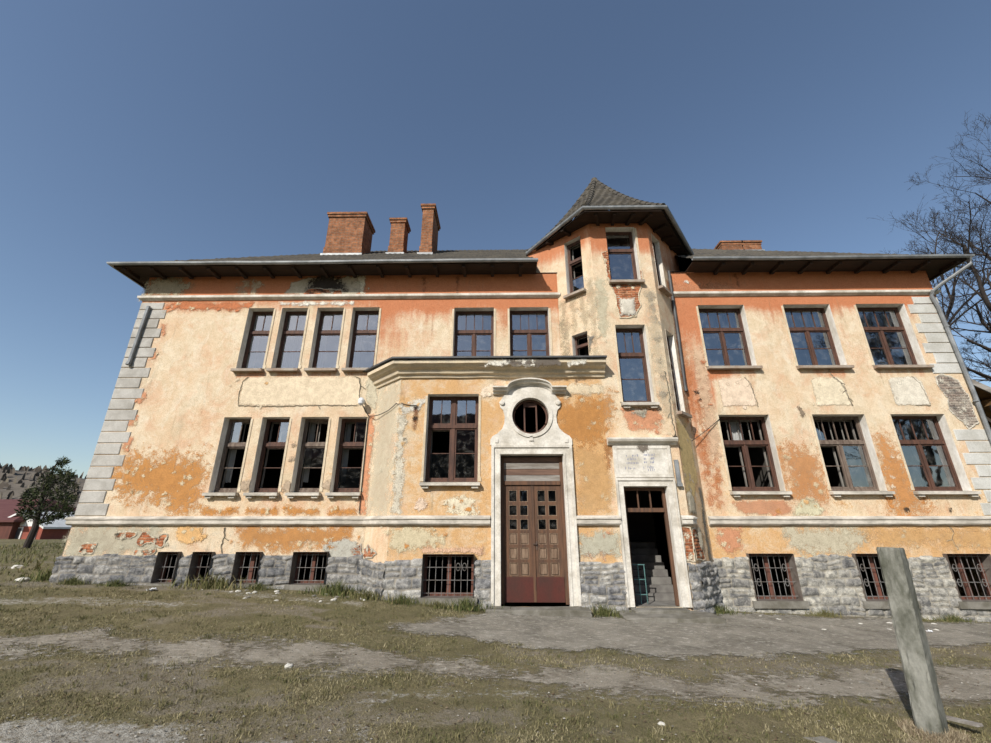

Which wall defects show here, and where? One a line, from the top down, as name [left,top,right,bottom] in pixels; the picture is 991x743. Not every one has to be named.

flaking render [485,251,661,367]
peeling [109,392,486,559]
peeling [556,383,663,515]
peeling [693,346,722,468]
peeling [673,419,743,562]
flaking render [934,374,979,430]